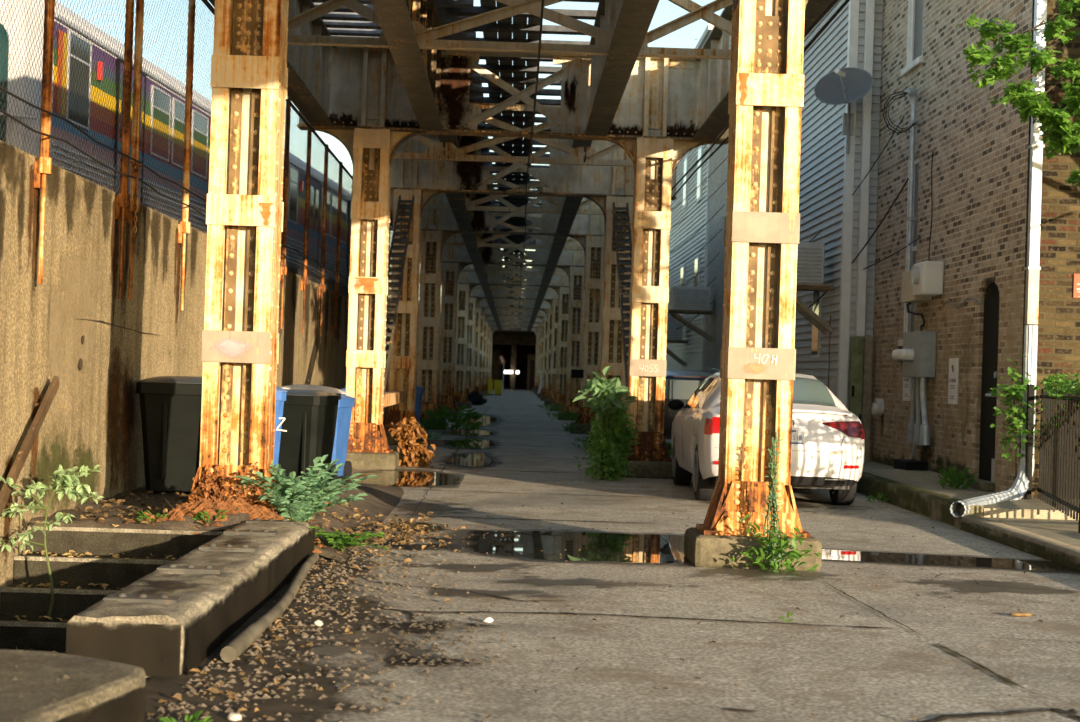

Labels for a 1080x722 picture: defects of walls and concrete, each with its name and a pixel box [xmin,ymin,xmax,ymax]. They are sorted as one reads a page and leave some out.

rust [739,73,749,105]
rust [439,55,496,263]
water stain [0,143,25,259]
water stain [47,164,112,240]
water stain [134,206,198,286]
rust [259,203,273,226]
rust [354,277,378,293]
rust [106,348,134,489]
crack [918,708,1080,722]